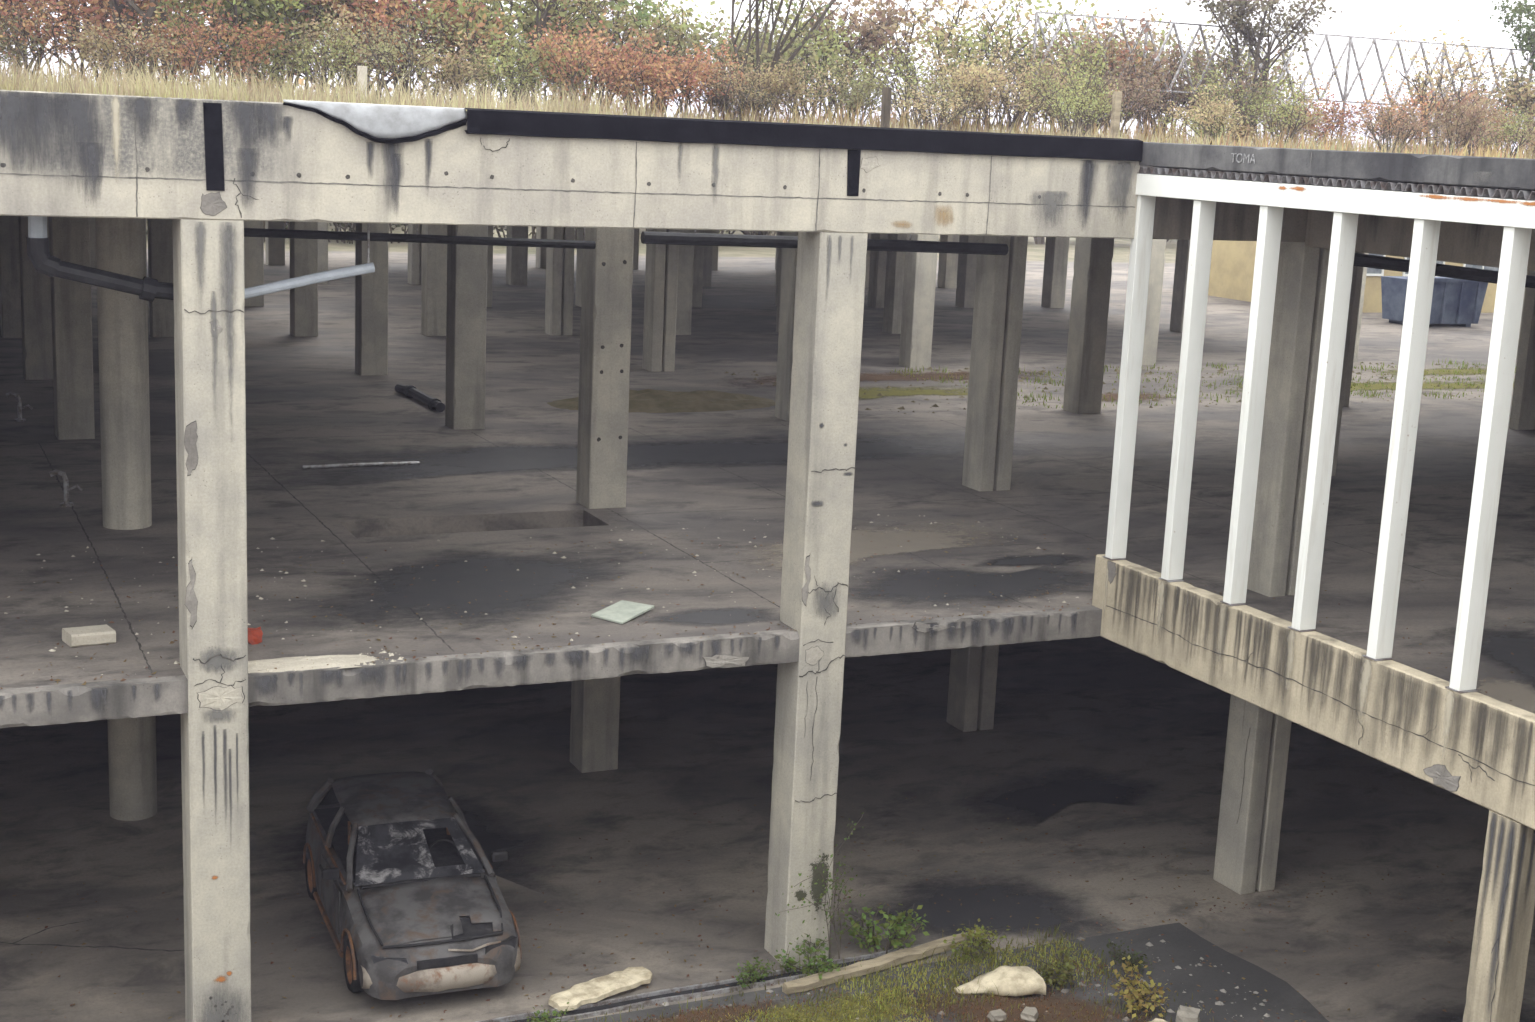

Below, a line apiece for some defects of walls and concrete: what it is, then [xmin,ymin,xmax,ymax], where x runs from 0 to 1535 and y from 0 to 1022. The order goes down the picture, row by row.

damp [0,91,151,190]
damp [232,102,291,198]
damp [368,142,400,199]
rust [1422,194,1535,206]
damp [325,552,612,626]
crack [193,654,246,686]
damp [321,665,406,687]
damp [547,608,780,666]
crack [795,576,848,802]
crack [1106,605,1535,786]
damp [202,710,238,812]
spalling [1423,764,1461,792]